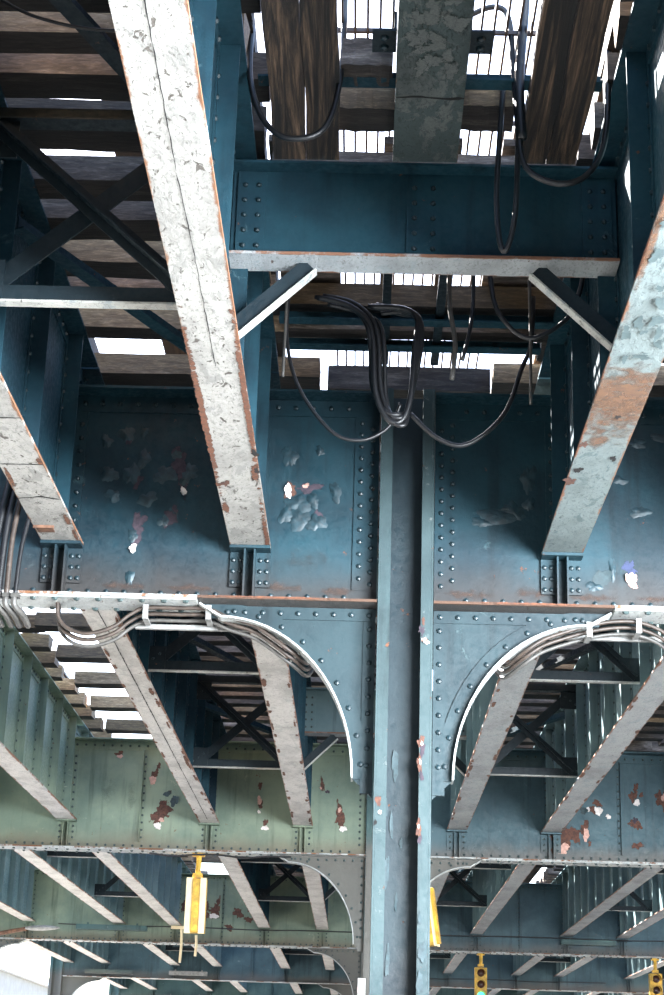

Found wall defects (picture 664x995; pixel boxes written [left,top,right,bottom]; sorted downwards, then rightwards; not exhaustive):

rust [584,369,656,446]
peeling [128,446,198,553]
peeling [277,482,342,532]
peeling [125,571,135,585]
peeling [586,558,638,591]
peeling [149,762,161,785]
peeling [149,800,173,830]
peeling [257,782,269,830]
peeling [320,777,347,832]
peeling [549,799,611,854]
peeling [627,783,664,830]
peeling [206,896,253,932]